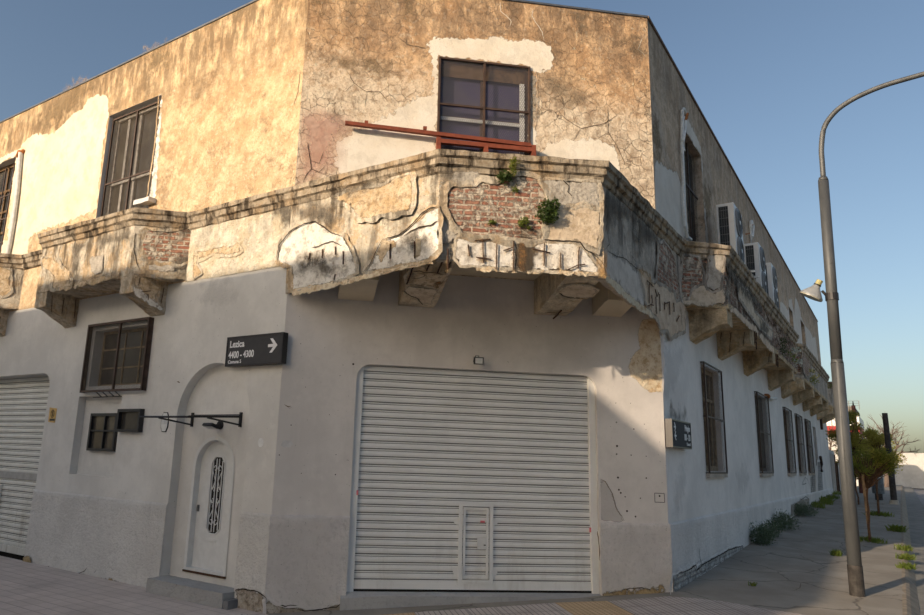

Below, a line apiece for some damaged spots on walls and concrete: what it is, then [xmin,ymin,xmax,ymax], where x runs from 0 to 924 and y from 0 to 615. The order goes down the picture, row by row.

crack [557,91,632,166]
leakage [606,191,658,256]
flaking render [40,255,120,318]
flaking render [129,226,243,310]
flaking render [274,170,779,395]